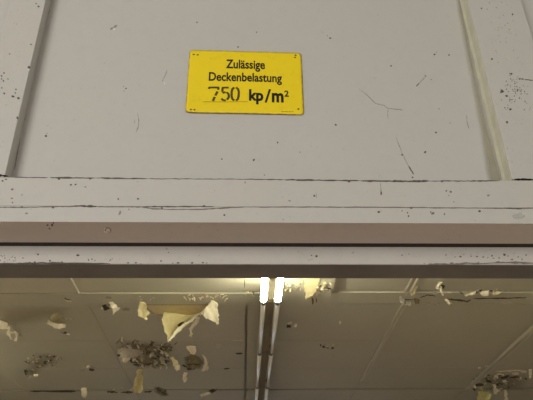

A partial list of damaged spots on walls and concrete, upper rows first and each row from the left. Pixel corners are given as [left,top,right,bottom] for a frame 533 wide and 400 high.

peeling [284,278,331,299]
peeling [399,282,445,306]
peeling [458,289,506,297]
peeling [100,302,120,315]
peeling [0,320,18,342]
peeling [115,294,228,393]
peeling [473,365,532,400]